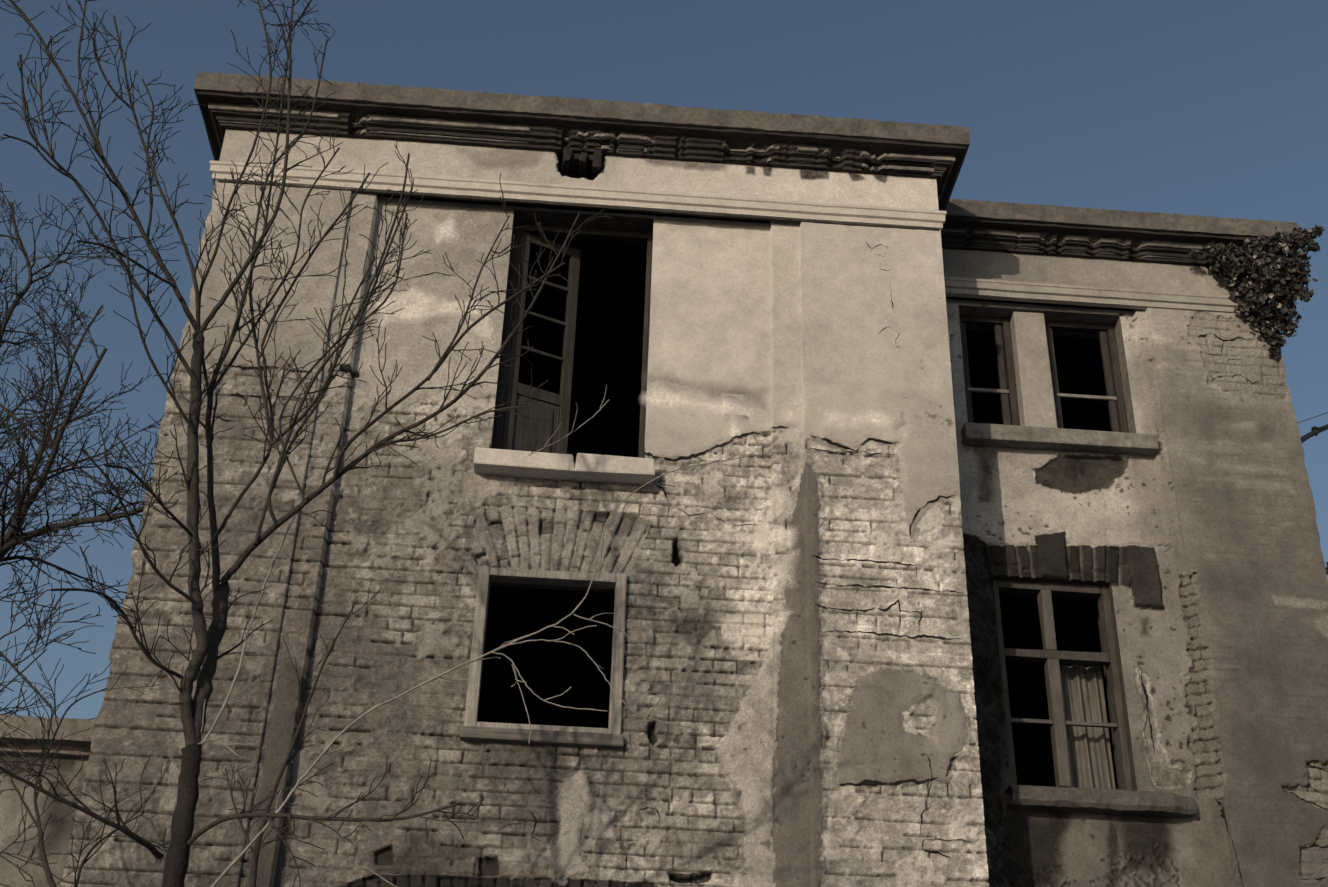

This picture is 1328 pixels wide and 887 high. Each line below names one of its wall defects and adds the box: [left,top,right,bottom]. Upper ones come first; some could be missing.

flaking render [1182,311,1288,402]
crack [641,426,897,526]
flaking render [1033,453,1130,494]
crack [810,495,963,640]
flaking render [626,425,1072,887]
crack [1137,661,1155,755]
flaking render [1137,572,1226,801]
flaking render [552,772,595,879]
water stain [994,813,1068,887]
water stain [1109,820,1171,877]
flaking render [1104,844,1181,887]
flaking render [1282,760,1328,810]